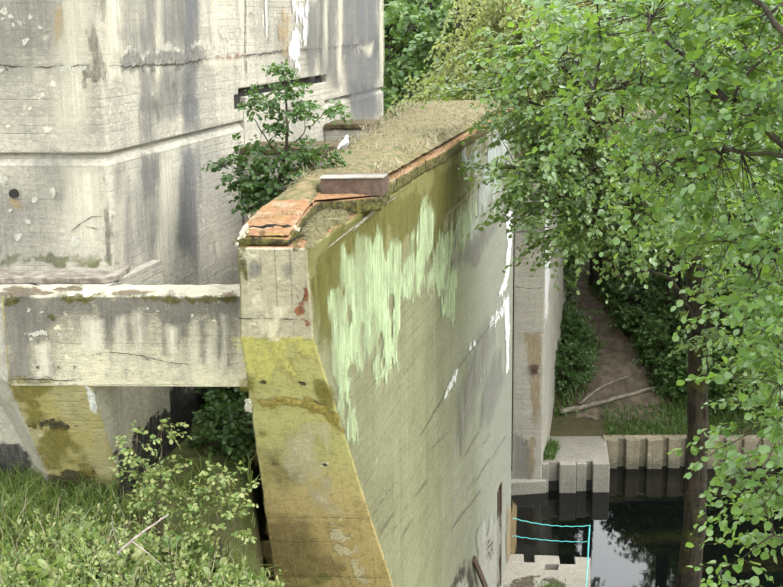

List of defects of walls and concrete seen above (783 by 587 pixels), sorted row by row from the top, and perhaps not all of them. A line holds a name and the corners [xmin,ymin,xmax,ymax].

leakage [107,0,229,141]
crack [1,0,376,87]
leakage [143,148,197,269]
leakage [0,285,237,503]
crack [91,352,189,365]
leakage [216,307,317,384]
corrosion [294,288,309,326]
leakage [328,128,513,442]
leakage [453,558,475,587]